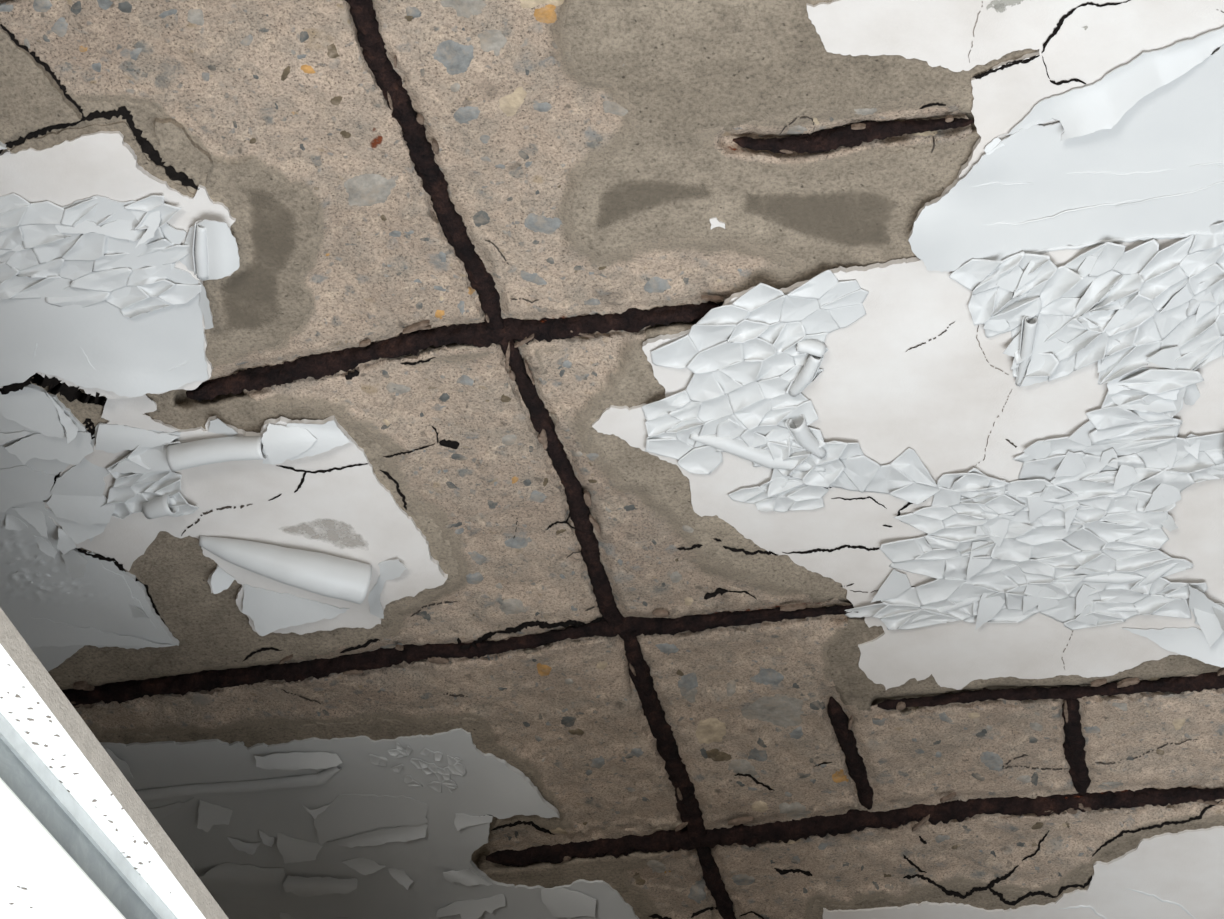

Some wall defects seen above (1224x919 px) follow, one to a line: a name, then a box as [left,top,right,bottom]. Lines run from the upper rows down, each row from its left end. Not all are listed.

crack [968,0,1131,85]
crack [0,24,199,190]
damp [224,195,292,326]
damp [600,183,707,225]
damp [747,196,887,244]
peeling [0,0,1224,690]
crack [0,373,107,439]
crack [181,426,460,536]
crack [677,487,924,556]
crack [75,548,165,624]
peeling [0,333,1224,919]
crack [903,800,1222,906]